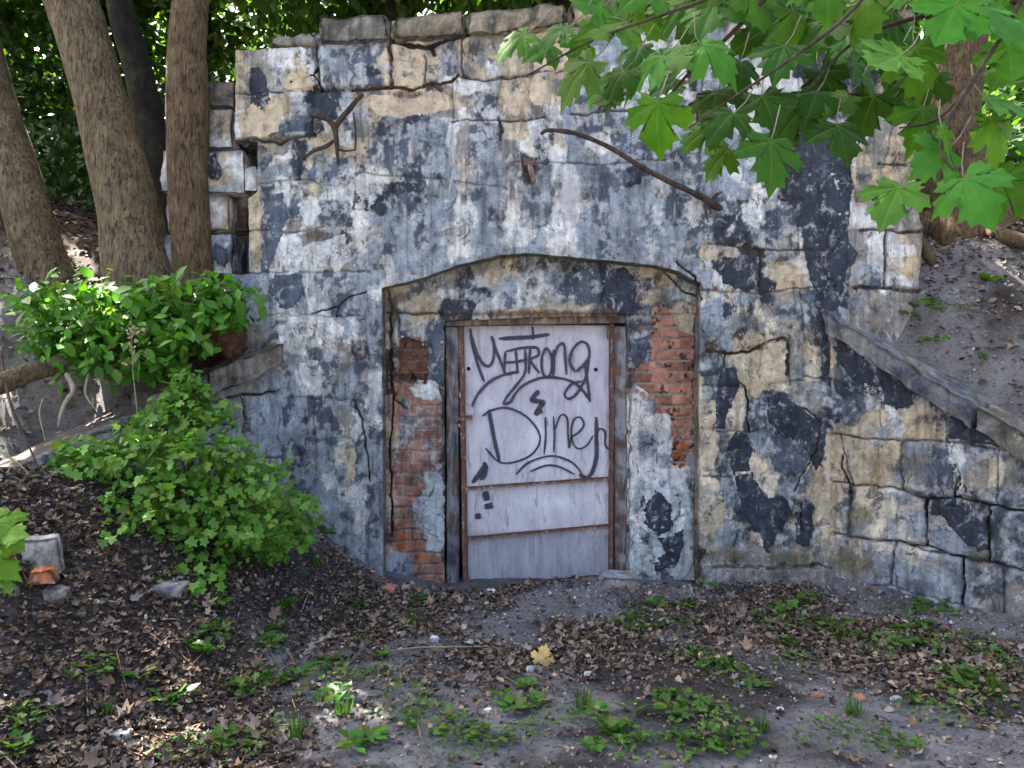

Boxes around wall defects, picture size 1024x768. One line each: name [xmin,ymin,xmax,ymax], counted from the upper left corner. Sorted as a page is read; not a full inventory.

crack [312,292,367,318]
spalling [399,322,446,401]
peeling [630,133,855,553]
crack [356,309,404,536]
flaking render [411,481,446,543]
crack [841,456,852,494]